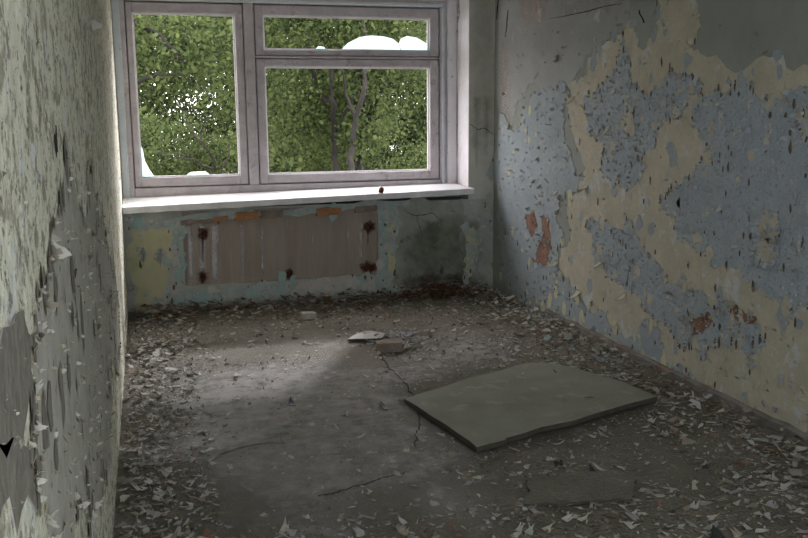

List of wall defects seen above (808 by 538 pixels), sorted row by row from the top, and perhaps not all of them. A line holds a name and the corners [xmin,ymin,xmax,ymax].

peeling [0,132,122,538]
flaking render [124,197,481,309]
peeling [481,0,808,433]